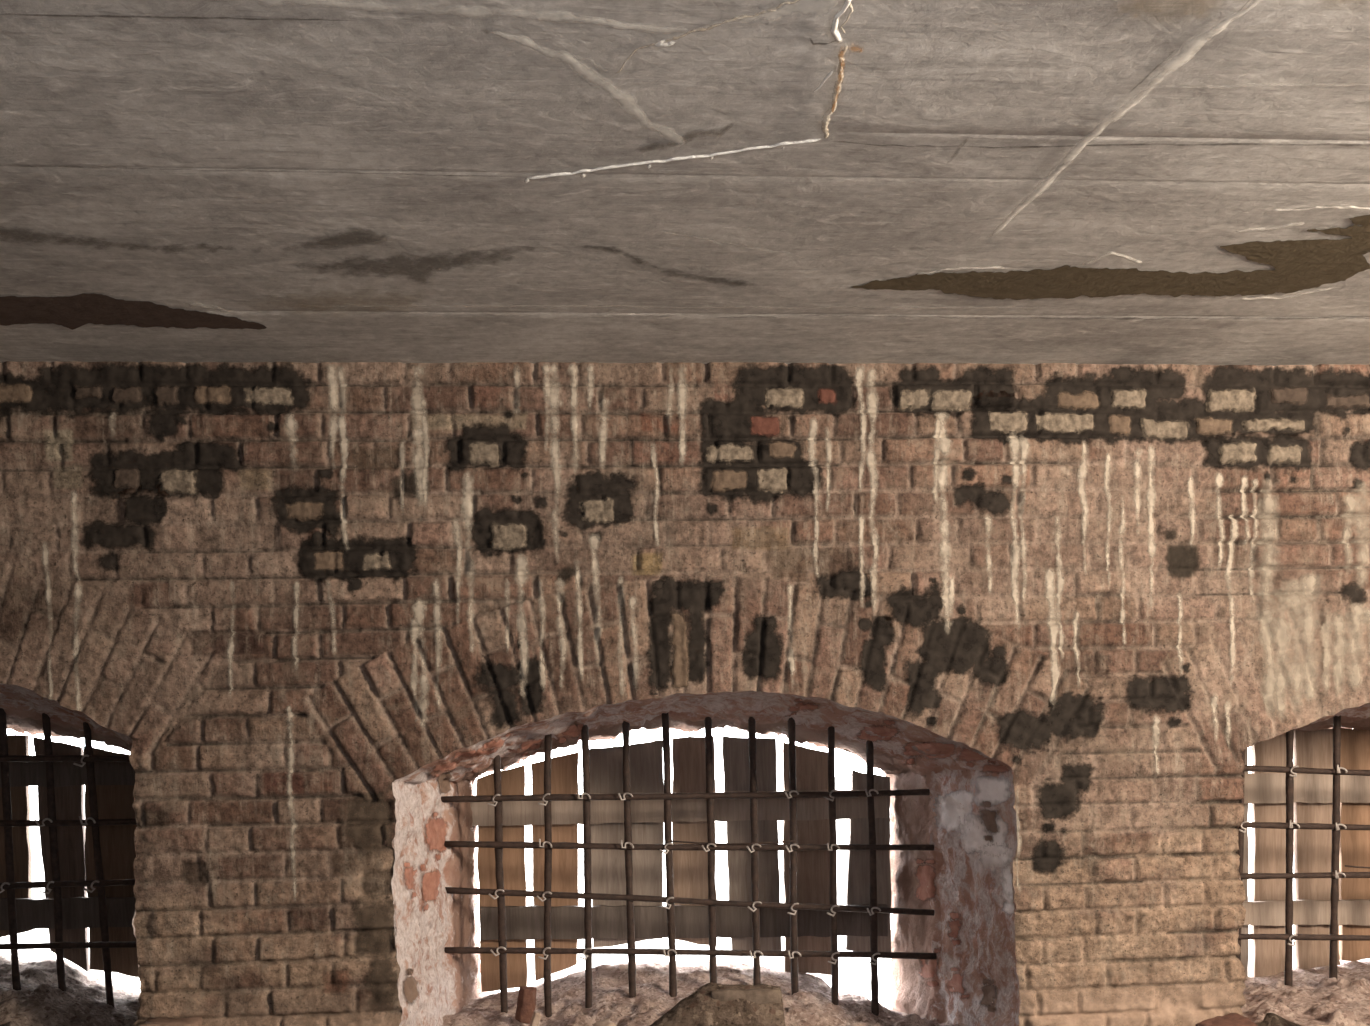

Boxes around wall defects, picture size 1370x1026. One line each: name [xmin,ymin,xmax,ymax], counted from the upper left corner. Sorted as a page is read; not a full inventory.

crack [186,0,384,20]
crack [458,0,1258,233]
leakage [0,362,312,710]
leakage [271,366,418,665]
leakage [393,365,638,728]
leakage [618,576,725,695]
leakage [667,363,1370,726]
leakage [997,517,1105,764]
leakage [1125,595,1195,773]
peeling [404,812,447,911]
peeling [980,801,999,842]
leakage [960,763,1095,913]